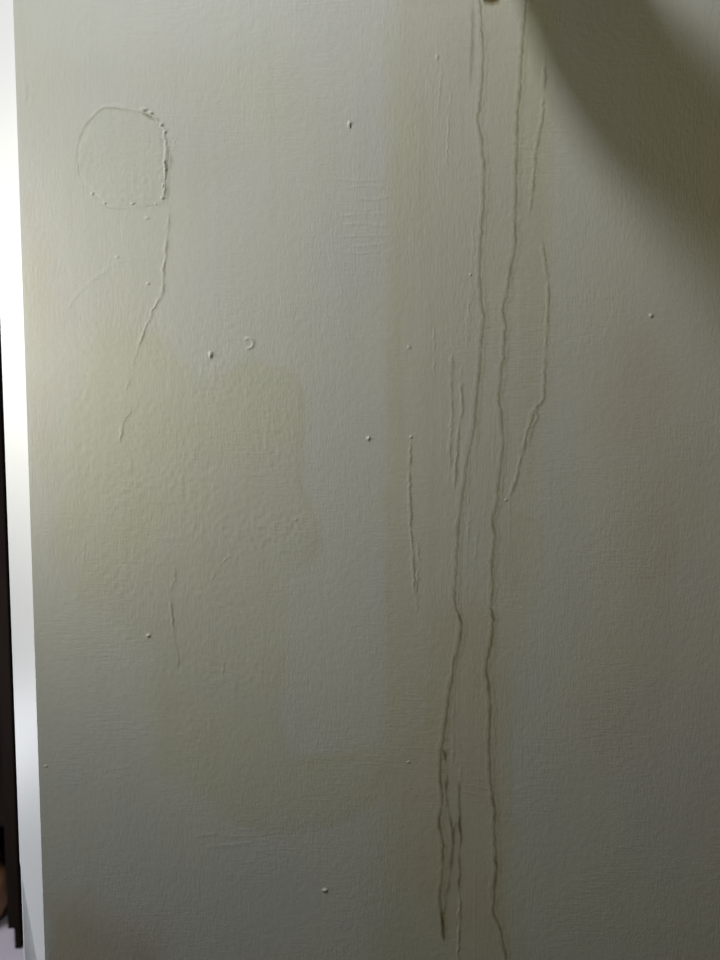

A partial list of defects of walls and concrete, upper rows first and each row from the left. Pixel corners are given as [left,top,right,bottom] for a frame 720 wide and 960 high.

crack [118,212,172,444]
crack [433,0,551,960]